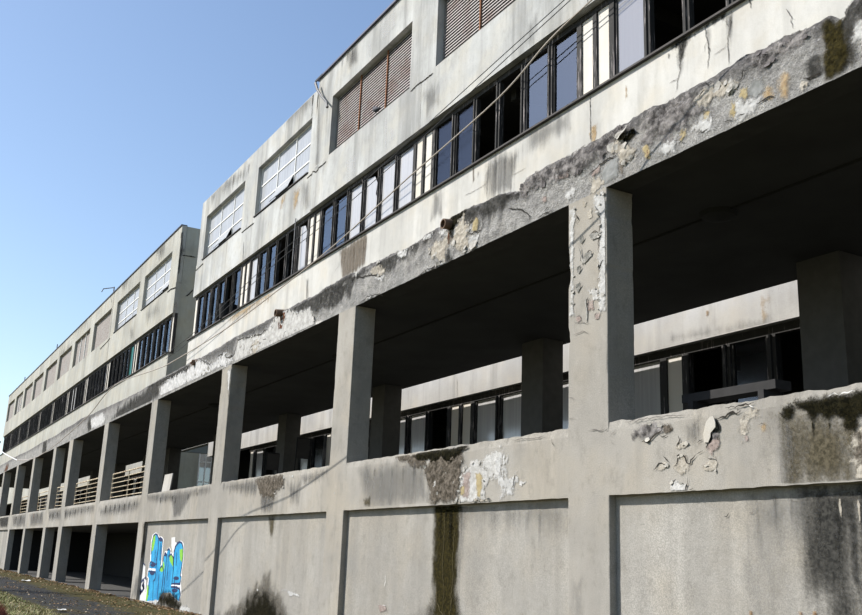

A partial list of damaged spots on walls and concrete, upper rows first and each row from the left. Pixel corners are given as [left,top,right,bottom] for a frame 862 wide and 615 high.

crack [670,15,759,96]
spalling [749,28,808,69]
spalling [800,55,825,90]
spalling [512,78,739,322]
peeling [370,258,385,281]
spalling [422,213,479,273]
peeling [159,307,322,396]
spalling [397,446,526,504]
spalling [631,421,690,491]
leakage [804,483,862,615]
leakage [229,578,299,615]